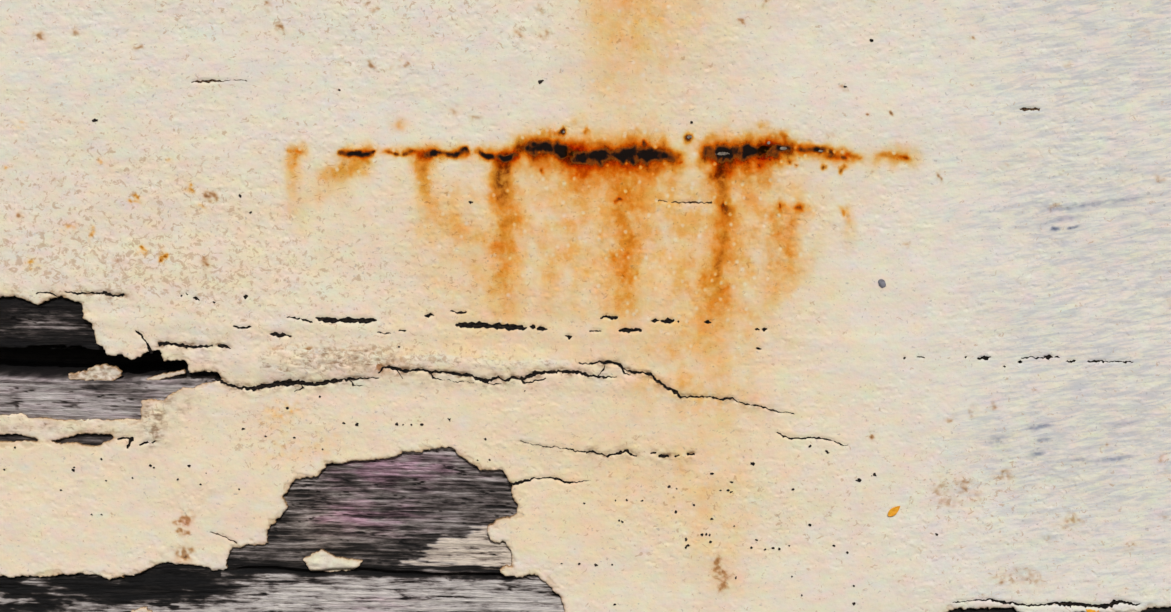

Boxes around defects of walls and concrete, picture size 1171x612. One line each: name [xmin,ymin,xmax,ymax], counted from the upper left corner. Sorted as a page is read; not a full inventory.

rust [338,127,679,200]
rust [702,140,846,215]
peeling [0,296,221,460]
crack [135,295,847,446]
peeling [0,447,564,612]